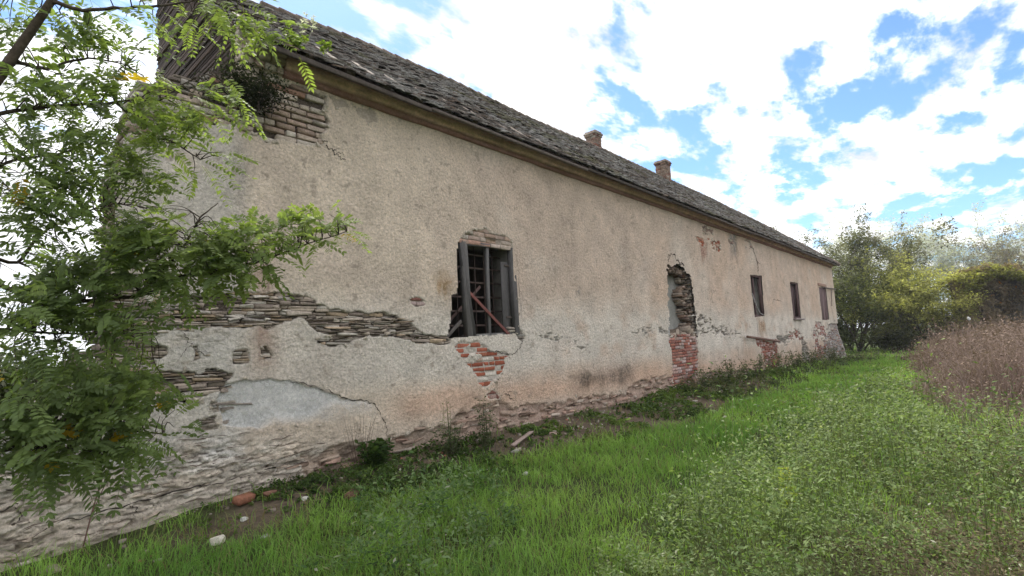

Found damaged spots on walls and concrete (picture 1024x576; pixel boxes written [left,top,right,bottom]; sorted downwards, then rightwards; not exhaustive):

spalling [129,74,377,147]
spalling [458,226,513,251]
spalling [756,320,846,368]
spalling [0,285,748,569]